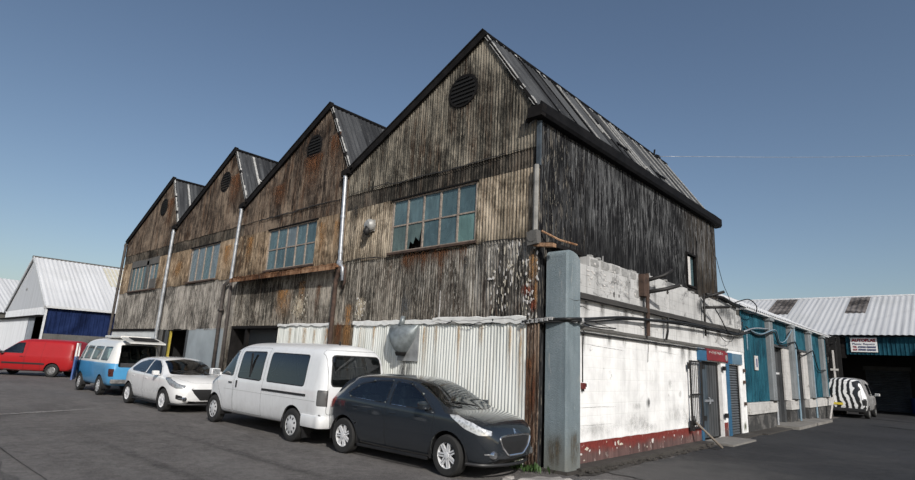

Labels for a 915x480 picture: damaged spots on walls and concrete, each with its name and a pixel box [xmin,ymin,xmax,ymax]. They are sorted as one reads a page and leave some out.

peeling [488,240,540,324]